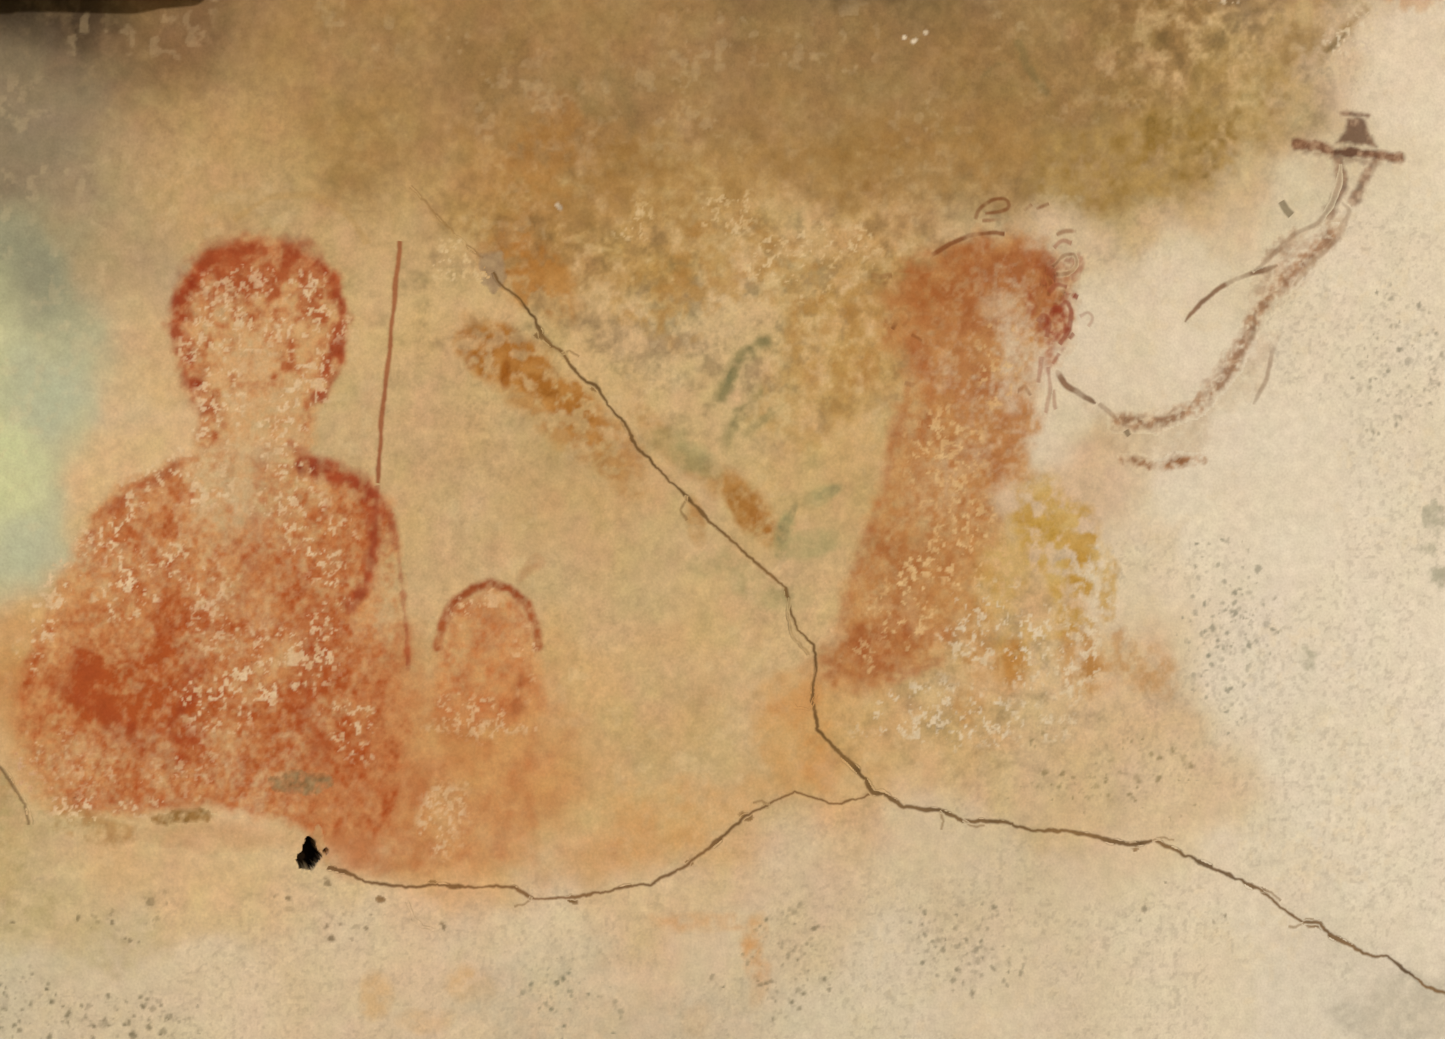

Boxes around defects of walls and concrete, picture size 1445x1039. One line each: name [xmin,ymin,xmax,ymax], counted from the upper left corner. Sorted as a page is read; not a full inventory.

crack [0,764,34,825]
crack [326,184,1445,995]